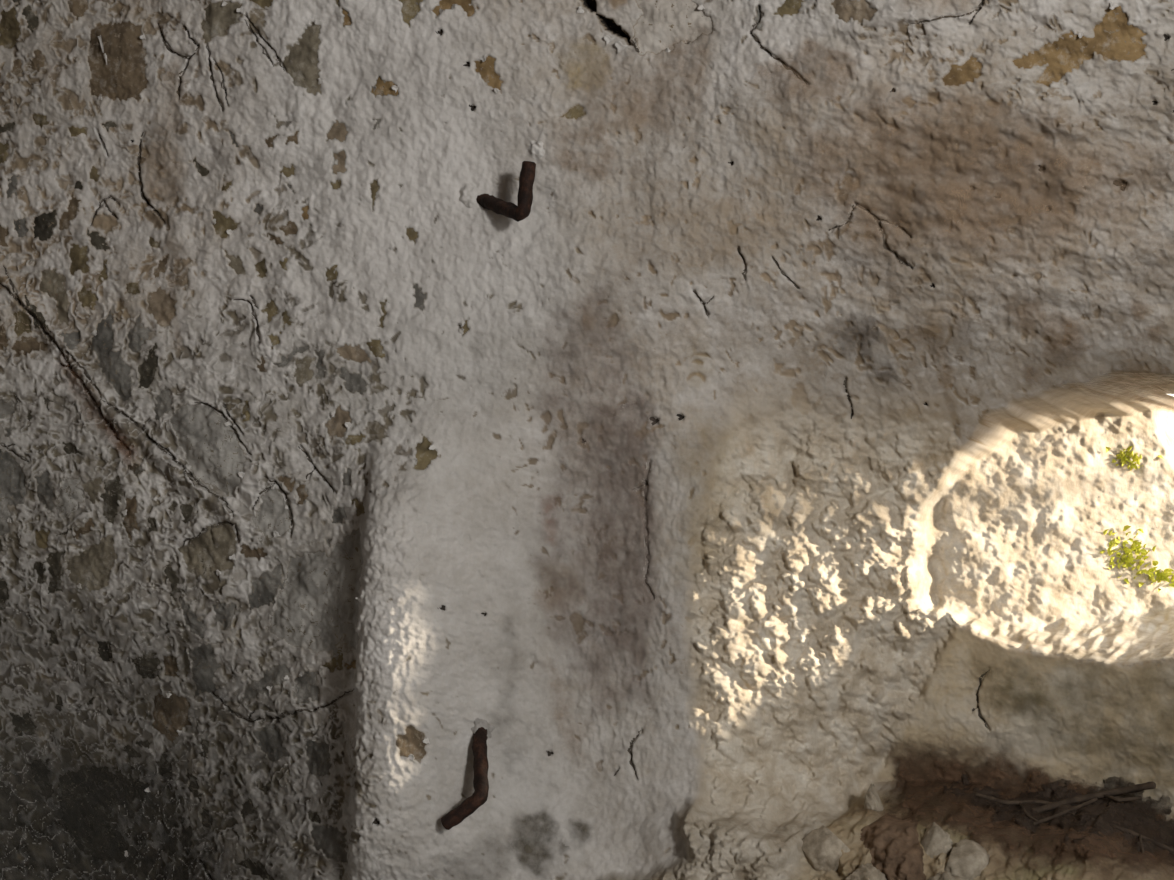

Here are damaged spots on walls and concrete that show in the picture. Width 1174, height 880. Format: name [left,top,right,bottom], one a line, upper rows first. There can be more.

peeling [0,0,45,79]
peeling [88,21,148,101]
peeling [201,0,273,43]
peeling [282,19,324,95]
peeling [399,0,478,27]
crack [576,0,640,54]
spalling [1013,2,1146,87]
peeling [0,166,99,247]
peeling [211,211,267,278]
peeling [0,230,176,420]
peeling [257,300,387,394]
crack [0,266,334,547]